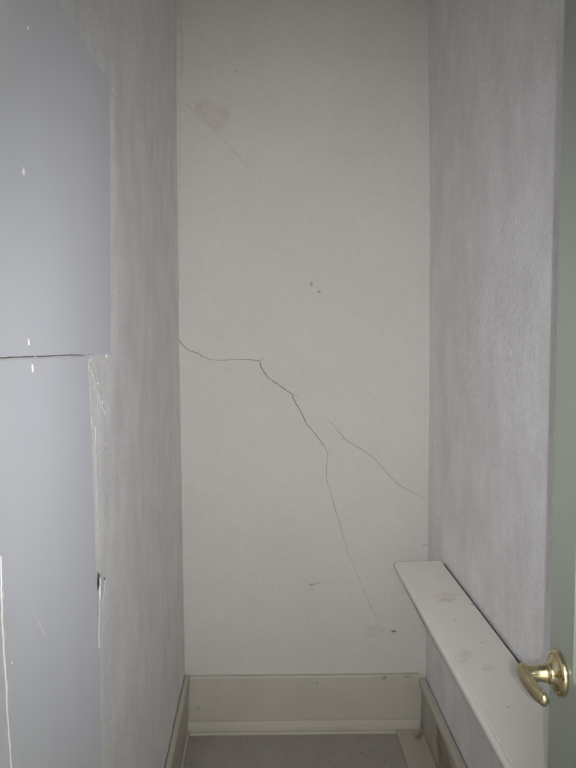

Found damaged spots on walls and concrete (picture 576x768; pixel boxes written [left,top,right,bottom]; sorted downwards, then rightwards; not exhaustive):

crack [179,340,425,618]